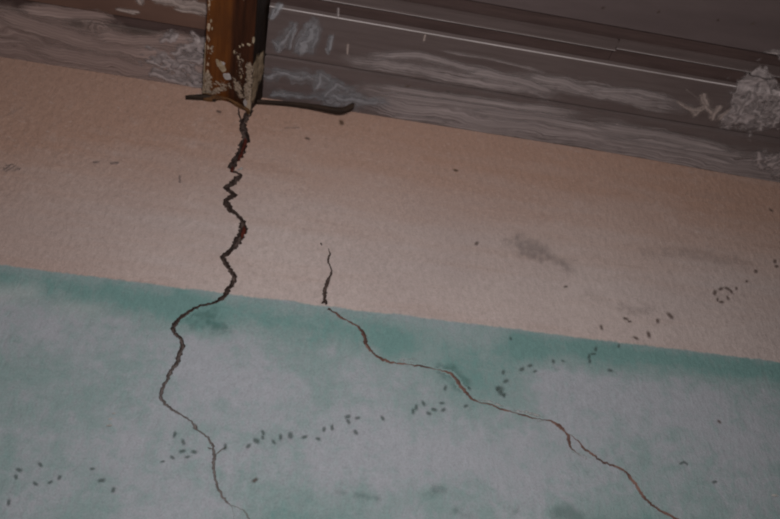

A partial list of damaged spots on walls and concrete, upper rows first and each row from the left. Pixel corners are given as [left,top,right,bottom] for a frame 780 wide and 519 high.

water stain [677,68,780,128]
crack [159,108,254,519]
crack [320,243,679,519]